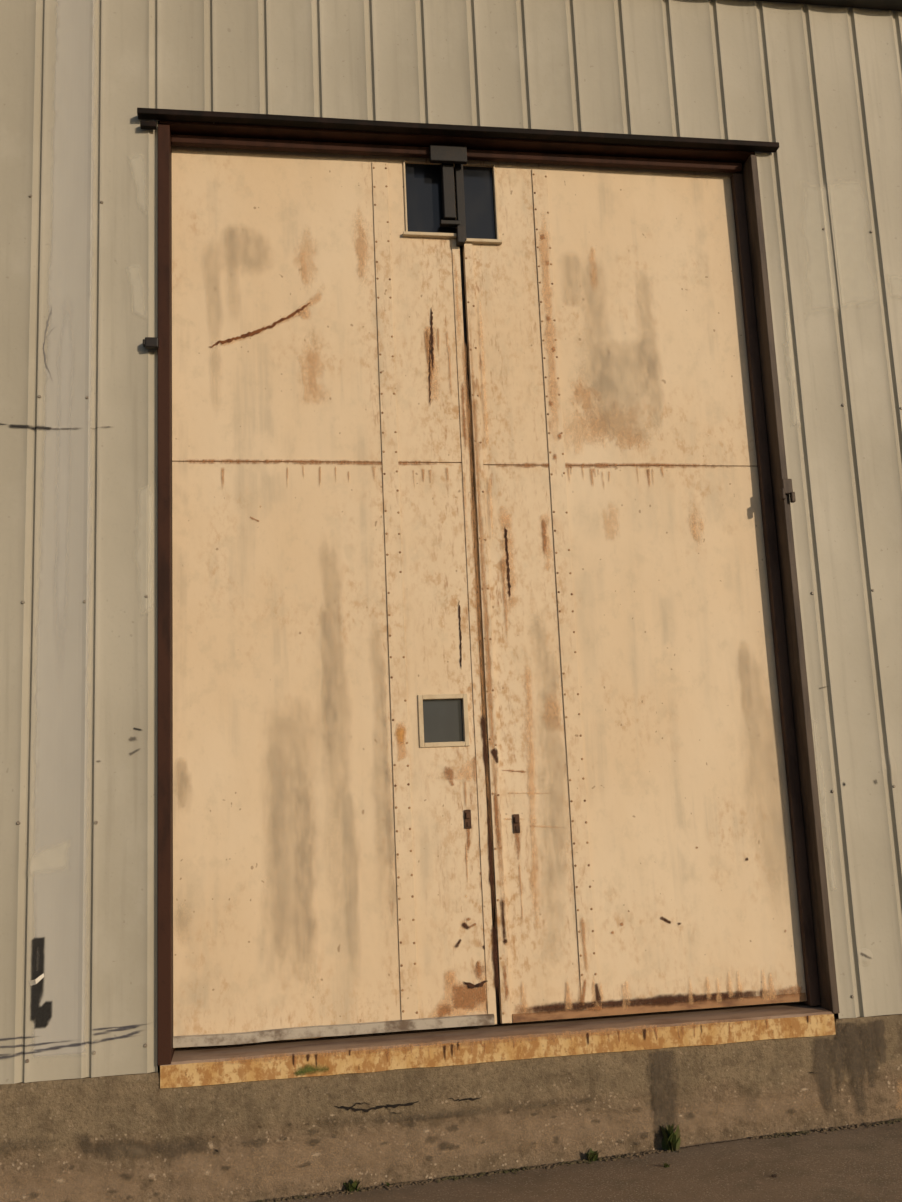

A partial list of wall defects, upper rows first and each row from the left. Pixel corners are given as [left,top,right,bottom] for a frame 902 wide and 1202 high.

corrosion [425,330,439,383]
corrosion [449,352,477,446]
corrosion [190,459,382,482]
corrosion [505,455,696,482]
corrosion [471,462,522,996]
corrosion [519,982,767,1013]
corrosion [436,1026,658,1057]
water stain [814,1020,886,1112]
water stain [650,1051,677,1137]